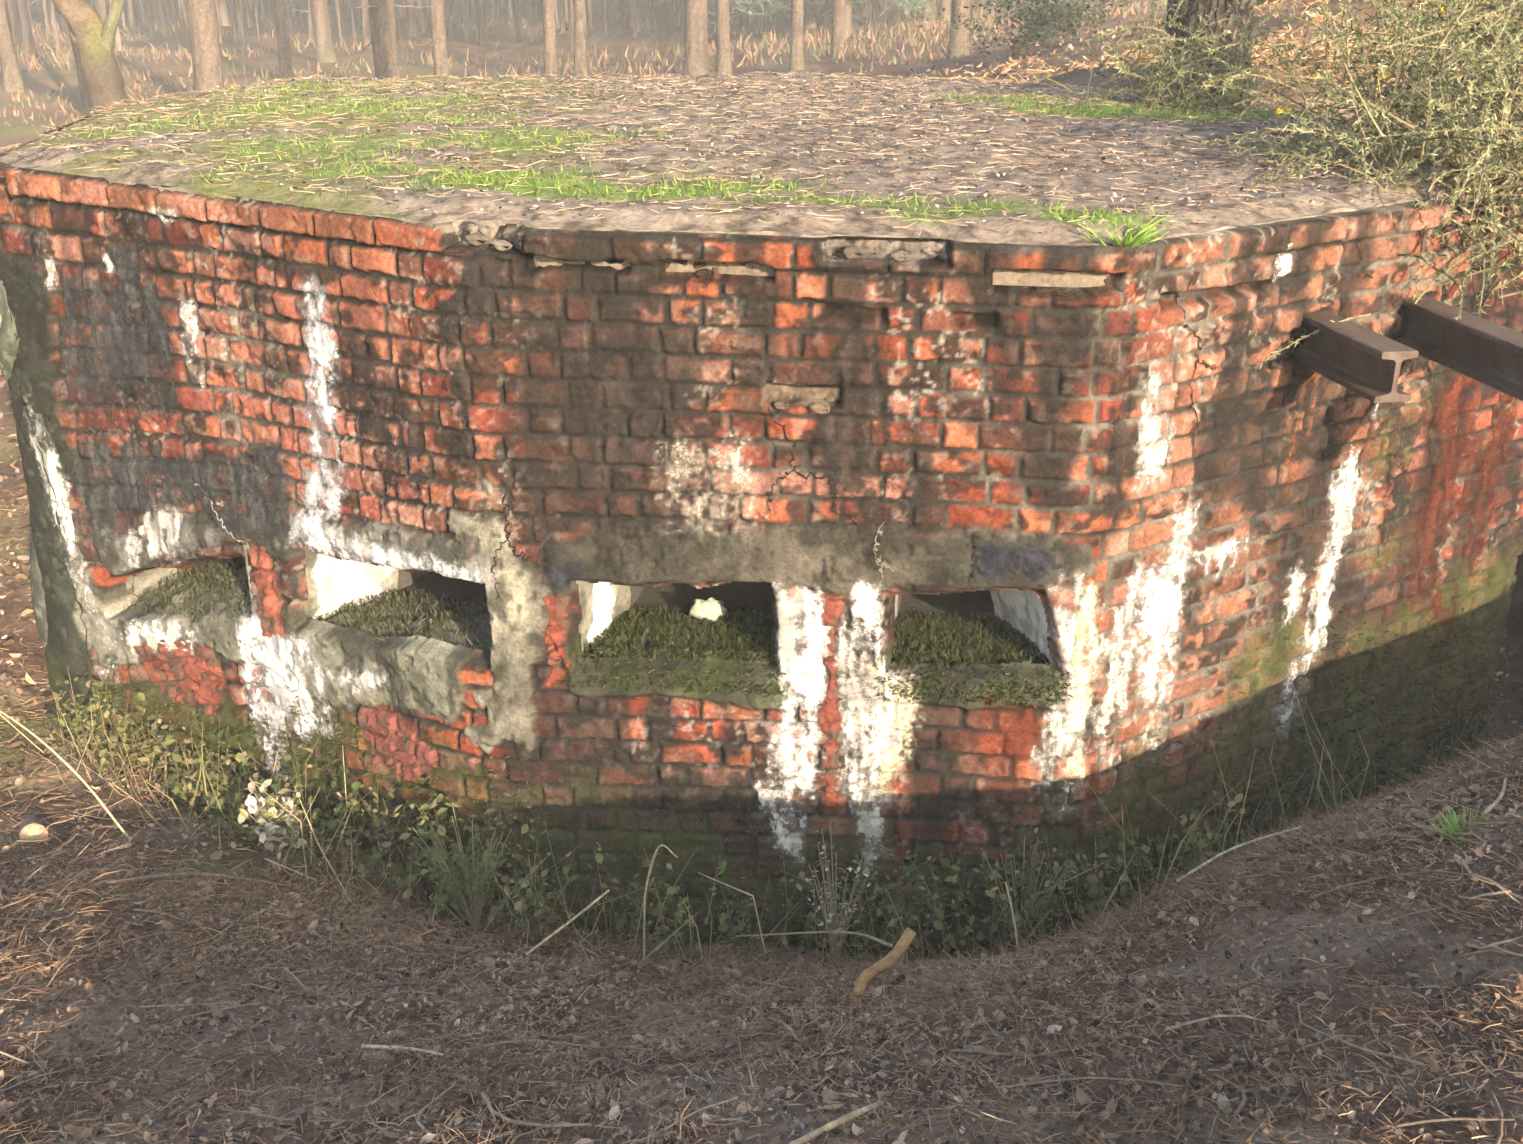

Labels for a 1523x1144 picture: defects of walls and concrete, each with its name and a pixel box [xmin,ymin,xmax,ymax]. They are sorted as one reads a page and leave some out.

leakage [30,413,195,676]
spalling [133,637,226,716]
spalling [247,541,286,639]
leakage [299,276,425,540]
spalling [357,705,440,783]
leakage [754,334,918,874]
leakage [1029,503,1249,820]
leakage [1274,297,1435,728]
leakage [1377,283,1449,341]